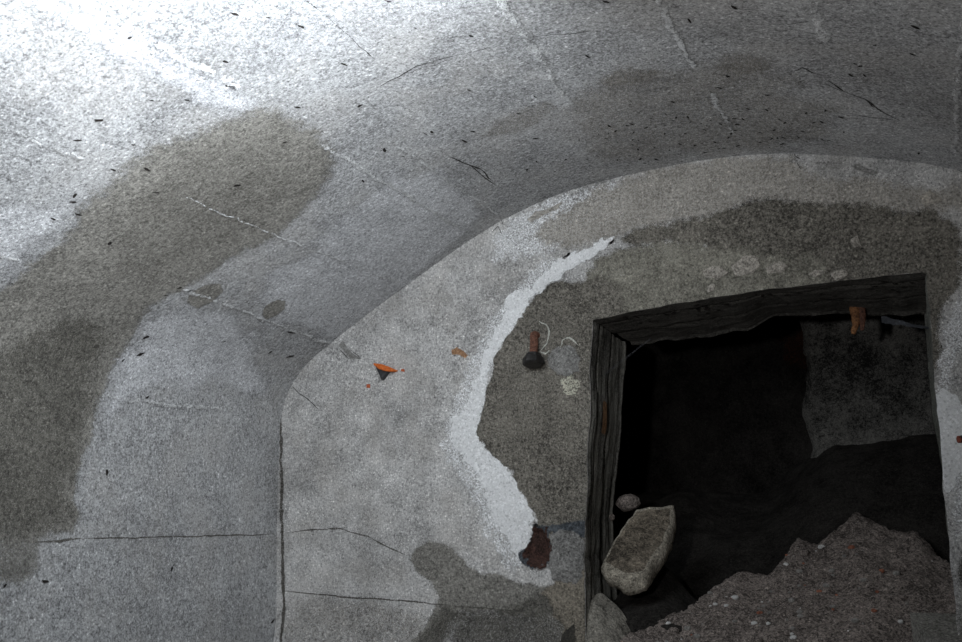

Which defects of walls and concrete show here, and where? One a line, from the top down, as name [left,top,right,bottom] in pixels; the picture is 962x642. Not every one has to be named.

water stain [0,0,499,589]
rust [518,519,585,570]
water stain [277,179,962,642]
water stain [480,42,857,168]